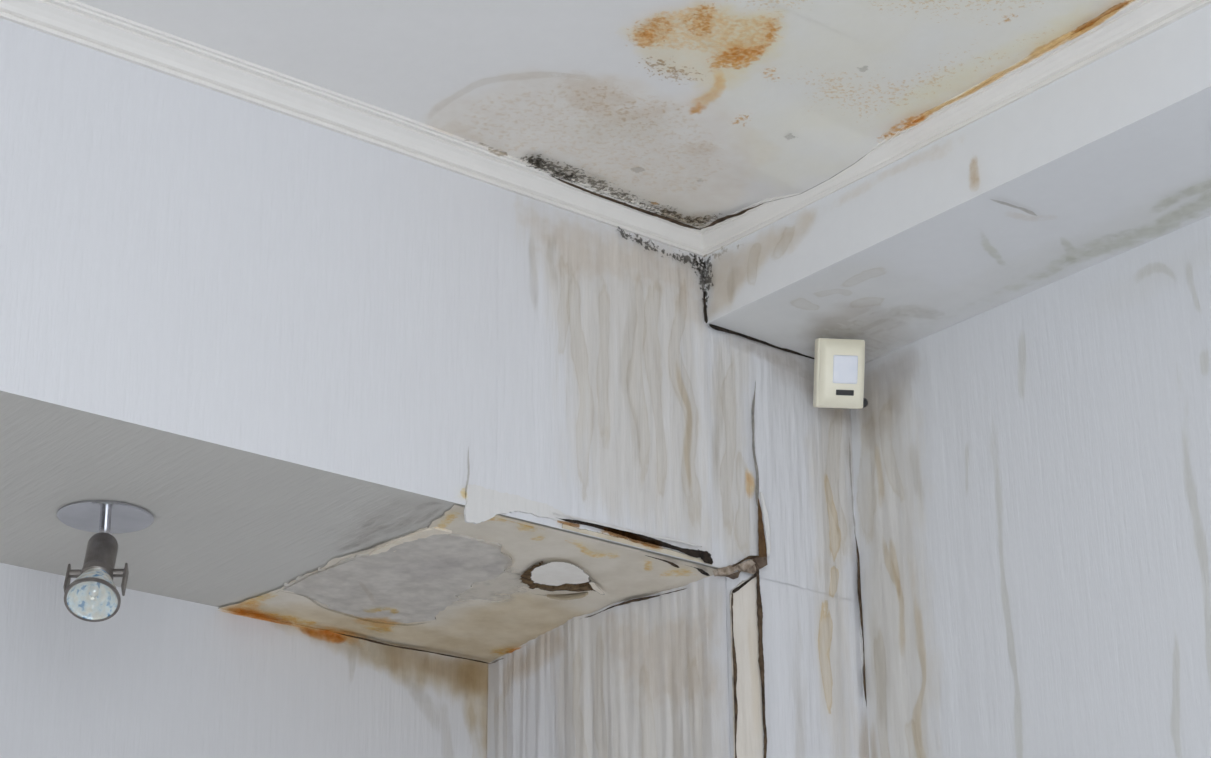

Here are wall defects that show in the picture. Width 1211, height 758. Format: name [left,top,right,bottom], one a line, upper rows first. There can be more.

leakage [520,154,717,226]
leakage [618,226,713,311]
peeling [219,505,768,758]
crack [553,381,771,758]